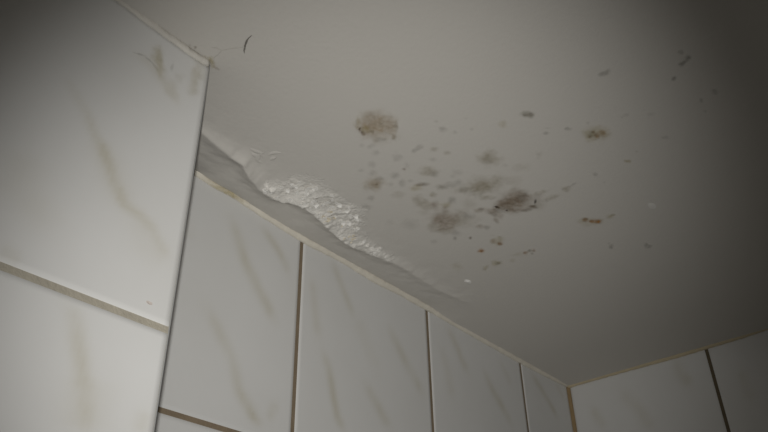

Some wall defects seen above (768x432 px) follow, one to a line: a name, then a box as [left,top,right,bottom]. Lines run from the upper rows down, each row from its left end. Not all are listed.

peeling [262,173,395,262]